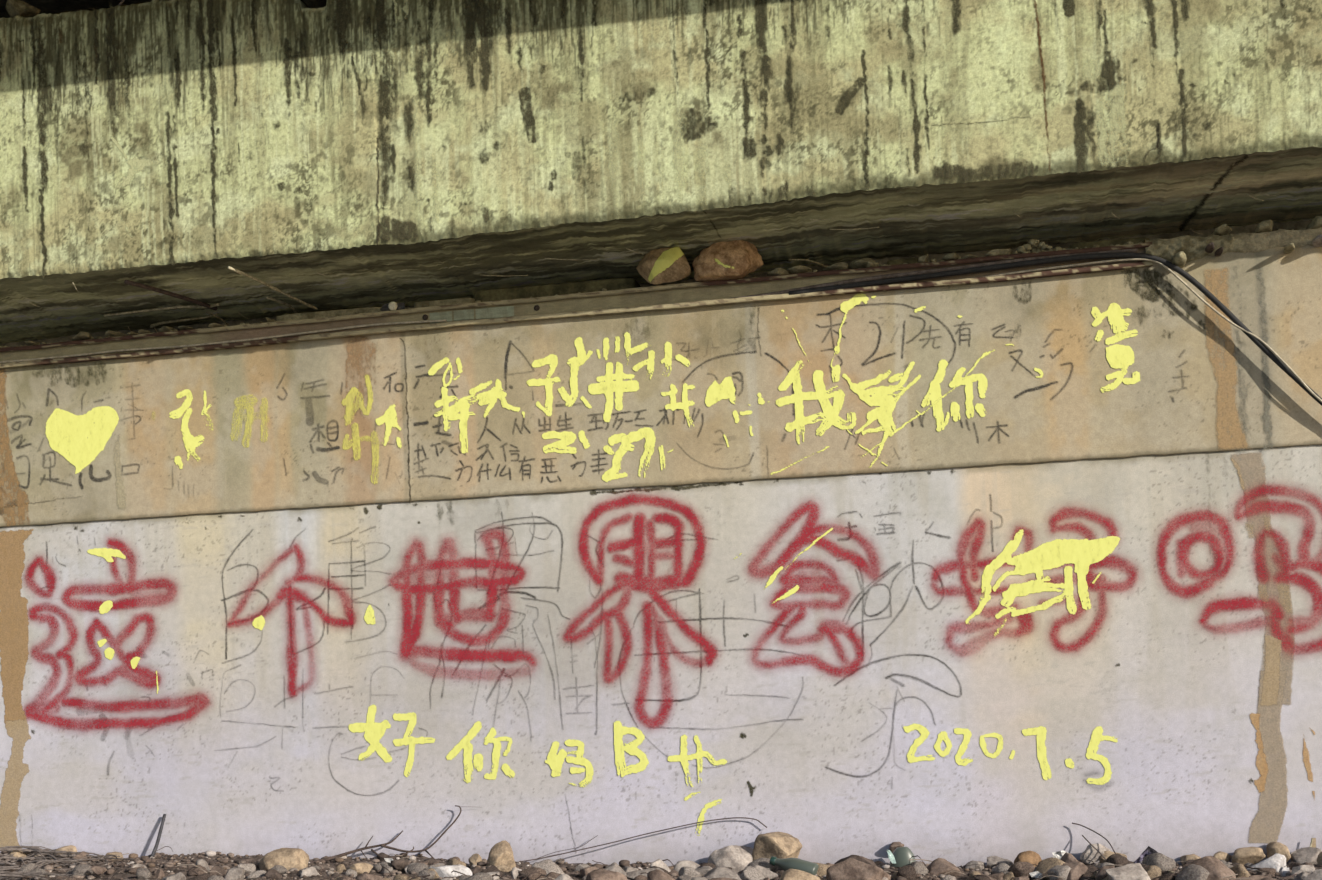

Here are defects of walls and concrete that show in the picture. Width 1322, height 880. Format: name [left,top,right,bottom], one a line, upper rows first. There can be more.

water stain [19,20,59,278]
water stain [166,0,237,265]
water stain [283,34,315,106]
water stain [326,0,533,241]
water stain [519,87,536,143]
water stain [737,0,796,200]
water stain [835,50,869,191]
water stain [888,0,1038,183]
water stain [1063,0,1075,17]
water stain [1074,1,1137,173]
water stain [1145,0,1157,48]
water stain [1171,0,1211,160]